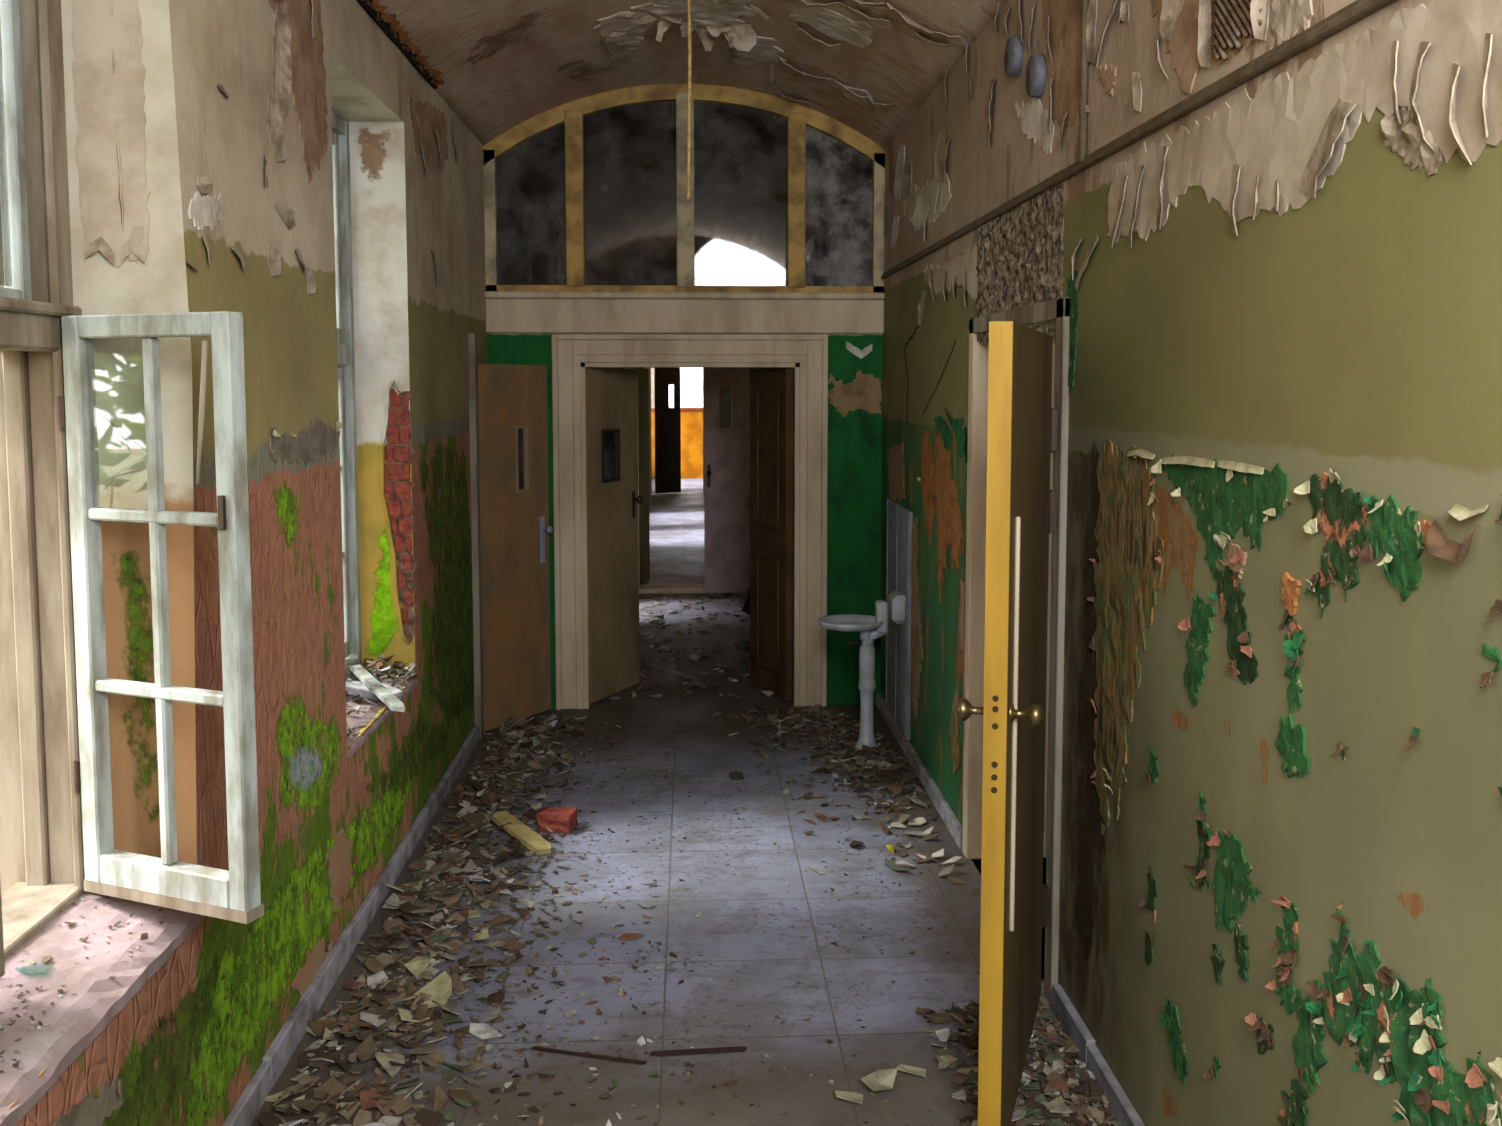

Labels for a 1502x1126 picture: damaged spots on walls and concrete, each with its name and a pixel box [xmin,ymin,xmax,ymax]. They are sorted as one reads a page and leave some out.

peeling [185,176,223,272]
peeling [264,0,328,230]
peeling [594,0,898,114]
peeling [789,0,996,148]
peeling [918,0,1502,393]
flaking render [377,380,418,645]
peeling [887,408,967,727]
peeling [1086,439,1502,835]
leakage [289,747,322,788]
peeling [1138,866,1158,967]
peeling [1160,997,1222,1087]
peeling [1184,792,1502,1126]